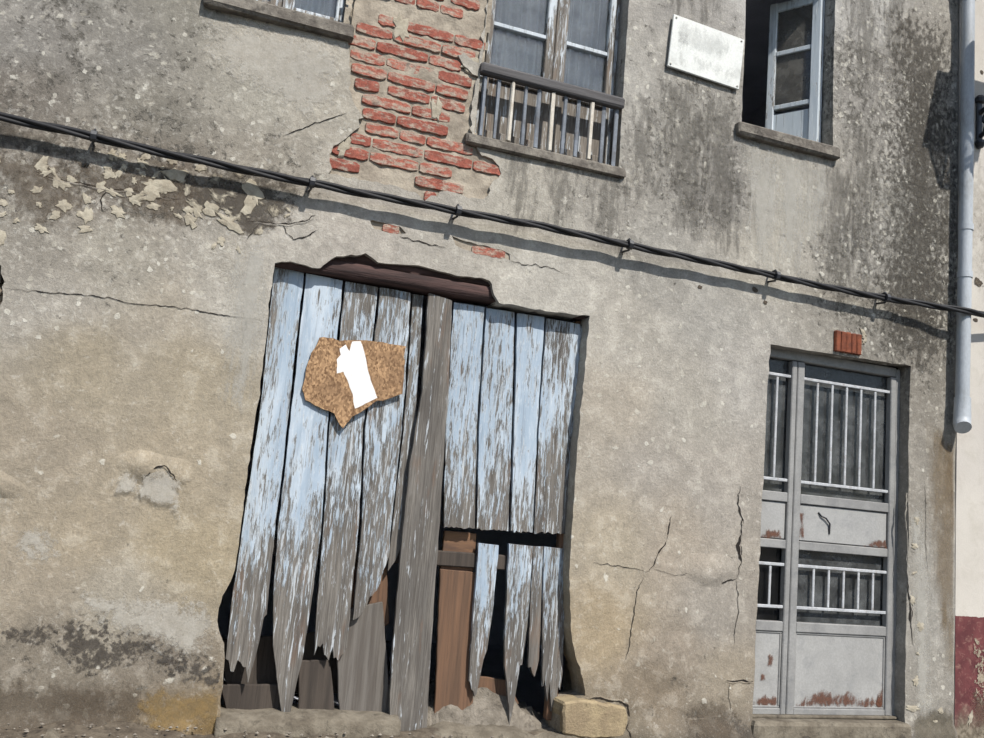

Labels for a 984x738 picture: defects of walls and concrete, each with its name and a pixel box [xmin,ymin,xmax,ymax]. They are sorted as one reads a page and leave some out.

flaking render [329,0,501,201]